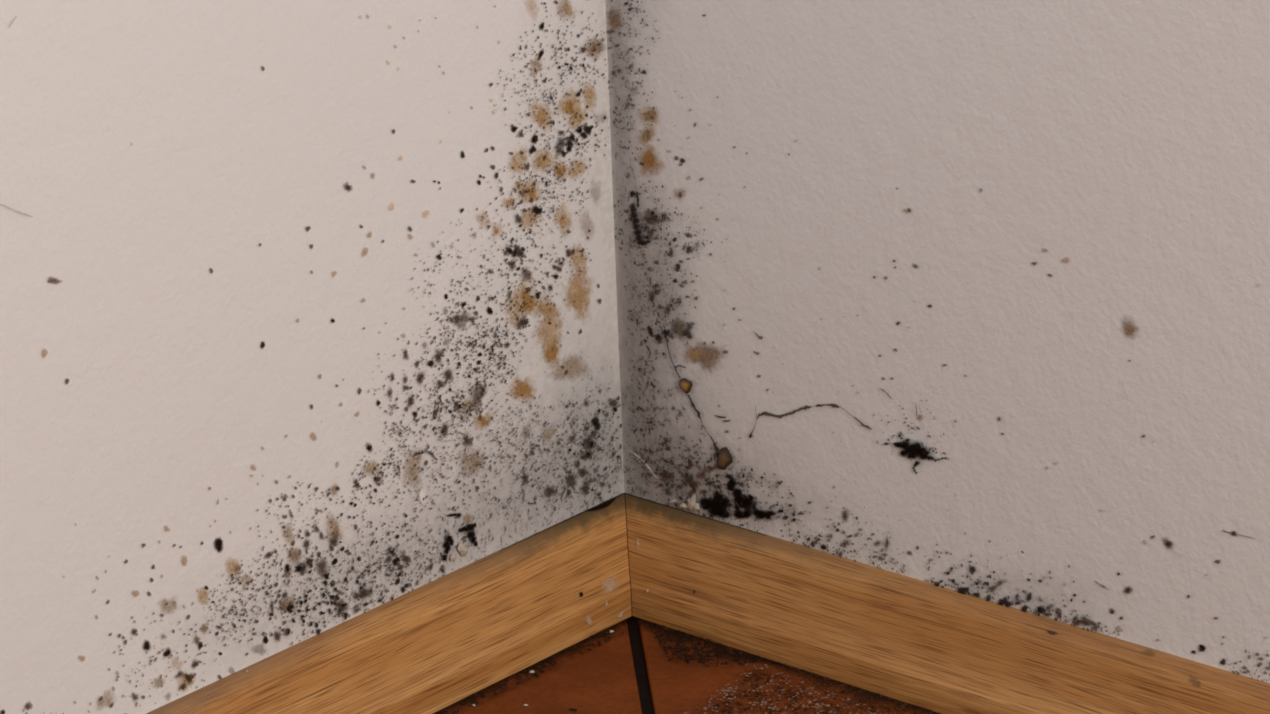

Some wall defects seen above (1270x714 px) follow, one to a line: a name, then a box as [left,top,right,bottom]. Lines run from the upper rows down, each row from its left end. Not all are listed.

water stain [109,0,1123,706]
crack [664,335,872,458]
water stain [693,672,880,714]